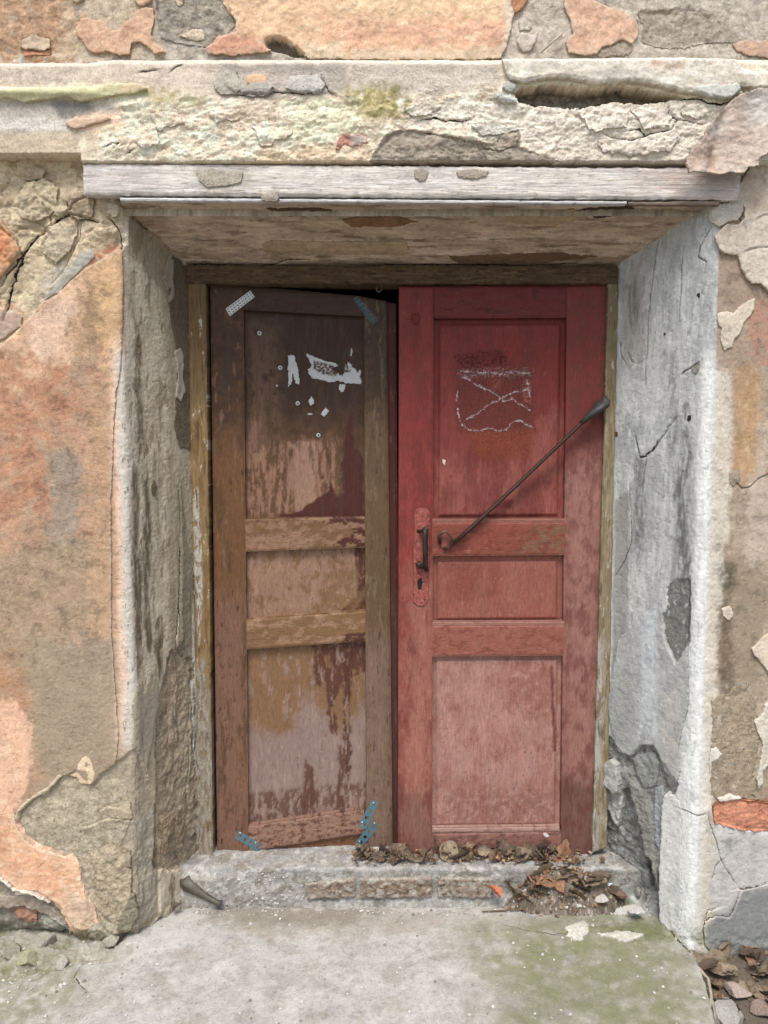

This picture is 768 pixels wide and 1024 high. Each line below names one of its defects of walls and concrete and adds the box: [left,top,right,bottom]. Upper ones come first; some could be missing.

peeling [19,35,51,57]
peeling [76,0,537,61]
peeling [564,0,768,59]
peeling [517,88,768,292]
peeling [0,218,21,279]
crack [3,214,154,311]
peeling [717,298,755,350]
crack [637,420,674,458]
peeling [0,249,133,937]
water stain [132,471,162,676]
peeling [601,575,692,936]
spalling [708,682,768,832]